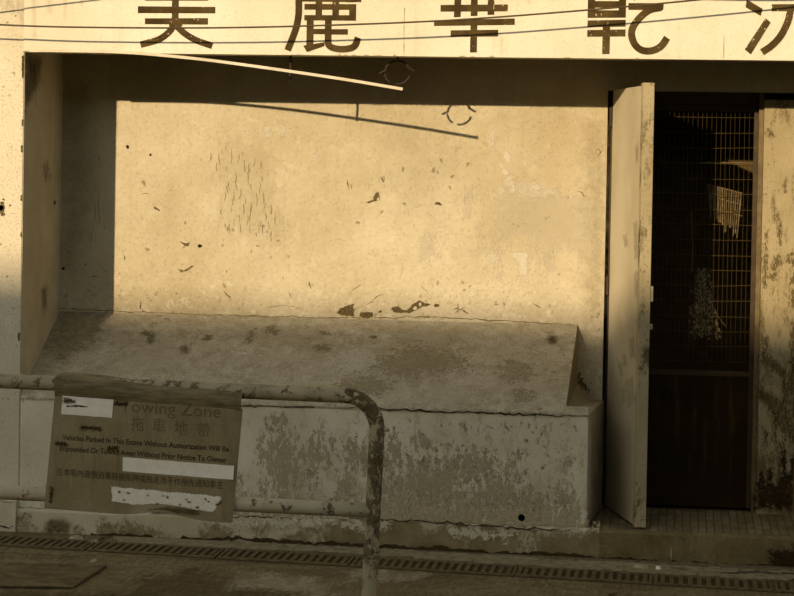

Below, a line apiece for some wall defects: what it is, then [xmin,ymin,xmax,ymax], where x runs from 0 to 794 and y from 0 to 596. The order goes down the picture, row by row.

crack [60,288,573,325]
spalling [337,299,439,319]
crack [577,372,590,393]
crack [379,407,587,417]
peeling [253,412,369,503]
peeling [380,426,600,541]
water stain [753,450,794,512]